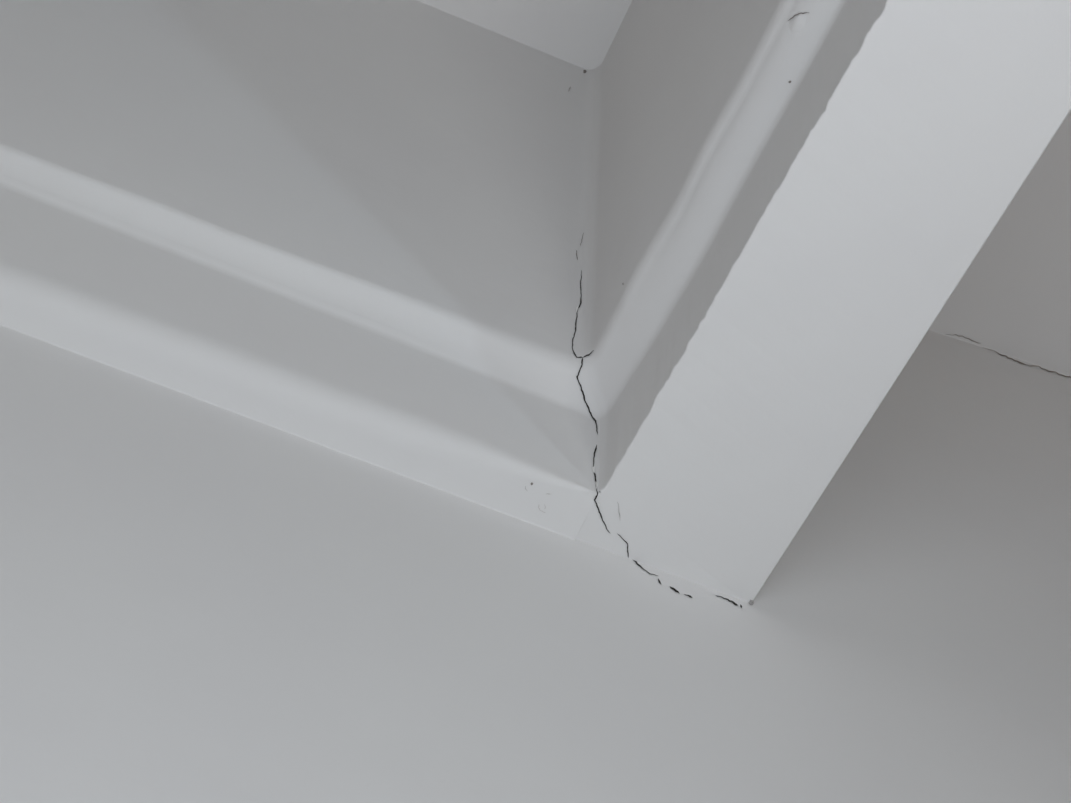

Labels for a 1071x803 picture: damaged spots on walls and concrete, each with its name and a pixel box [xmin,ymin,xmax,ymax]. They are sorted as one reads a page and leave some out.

crack [572,233,754,608]
crack [947,334,1071,378]